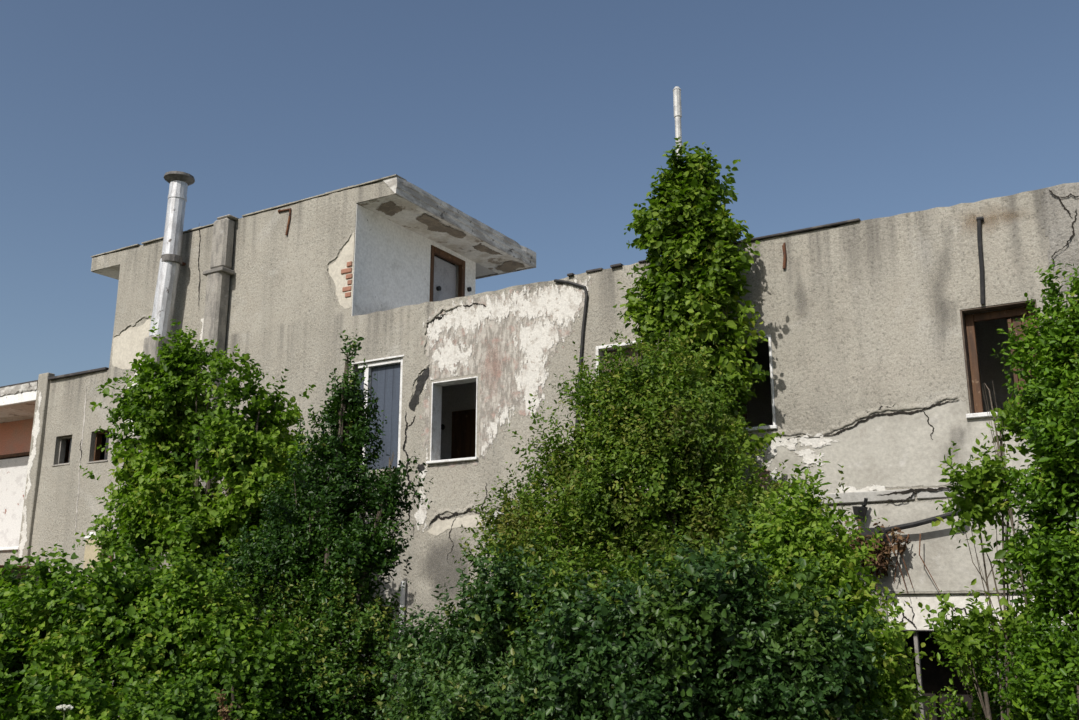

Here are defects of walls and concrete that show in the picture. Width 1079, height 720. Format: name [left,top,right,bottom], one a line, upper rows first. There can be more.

crack [1049,190,1079,264]
spalling [326,231,354,309]
peeling [408,274,591,532]
crack [764,400,958,446]
spalling [752,393,1036,496]